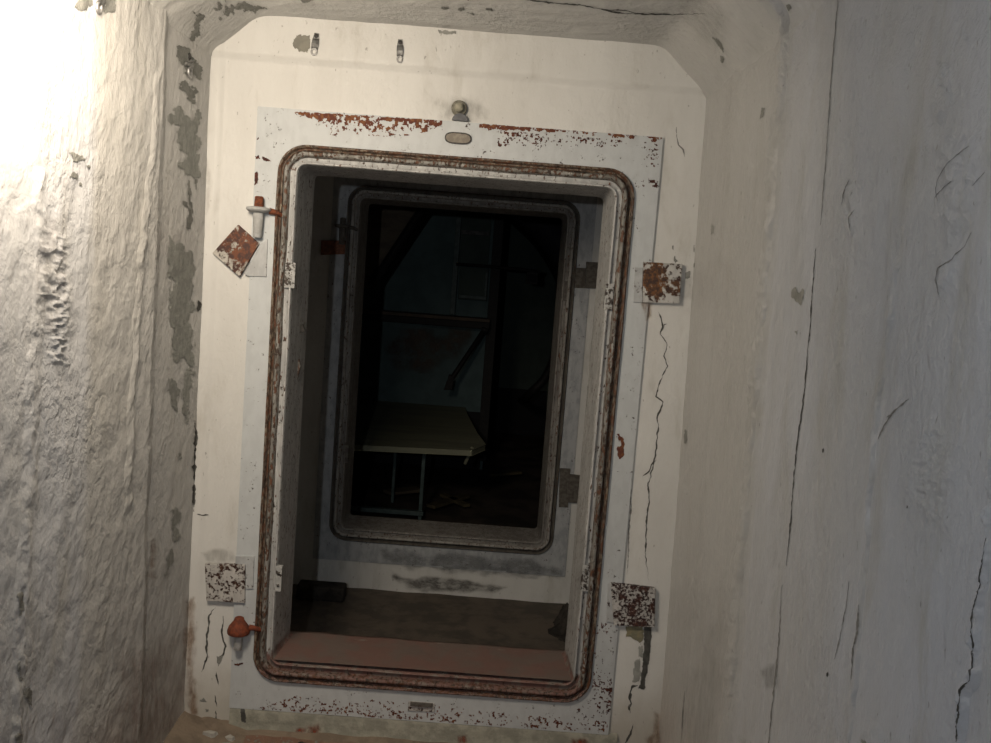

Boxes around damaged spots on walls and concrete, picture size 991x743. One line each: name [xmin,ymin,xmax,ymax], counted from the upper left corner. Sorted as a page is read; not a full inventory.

peeling [75,0,93,12]
peeling [104,0,116,14]
peeling [168,0,267,231]
corrosion [295,112,442,137]
corrosion [479,124,662,167]
crack [820,4,838,225]
peeling [167,236,196,424]
crack [627,312,668,580]
crack [768,249,816,743]
corrosion [260,652,612,743]
crack [955,538,986,741]